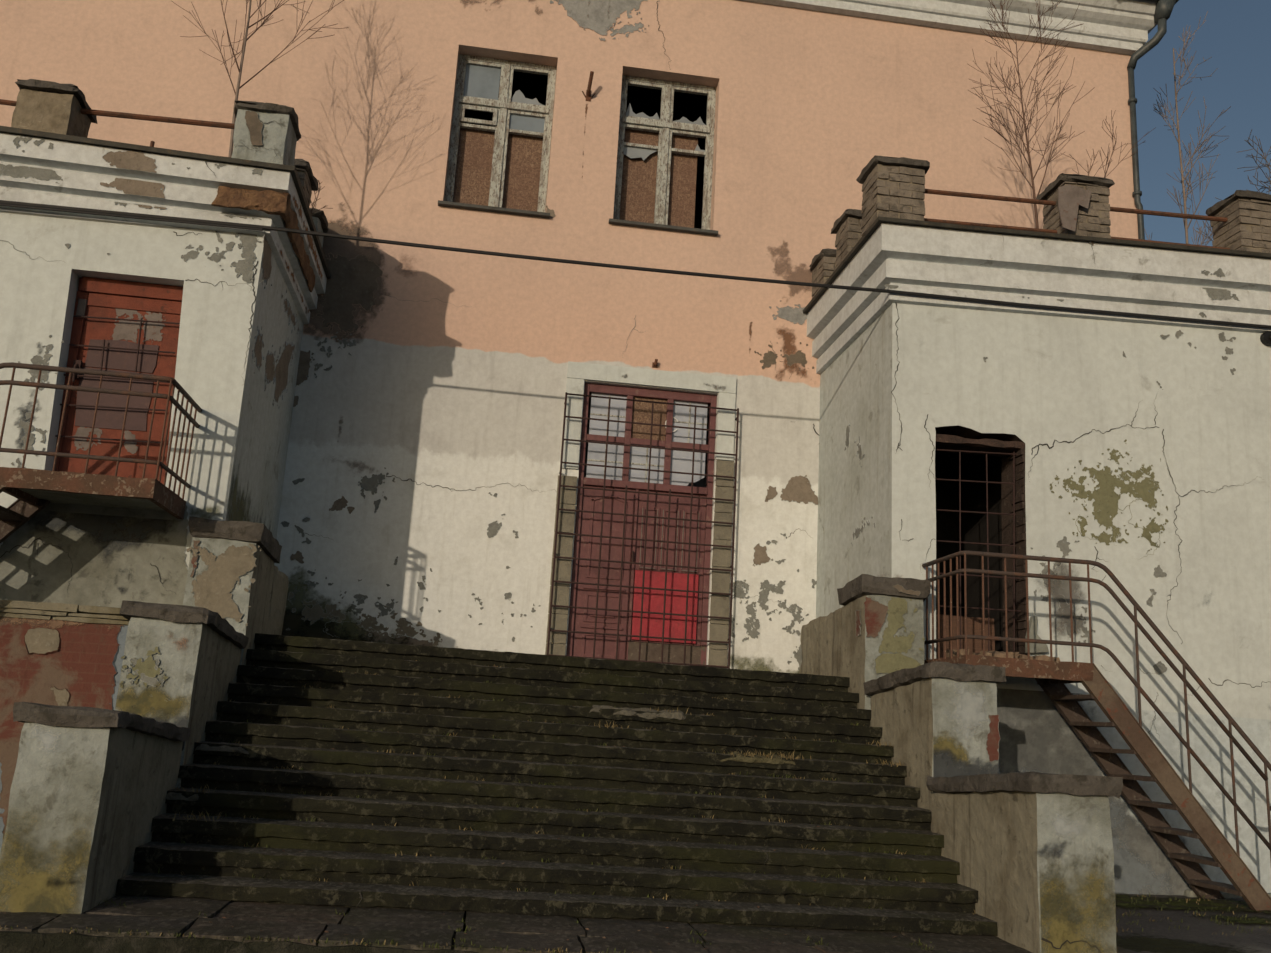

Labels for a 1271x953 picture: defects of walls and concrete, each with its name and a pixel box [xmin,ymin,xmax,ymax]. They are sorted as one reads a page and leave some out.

peeling [550,0,649,42]
peeling [181,214,357,407]
leakage [304,204,386,342]
flaking render [0,503,262,839]
leakage [281,610,381,643]
flaking render [280,517,443,647]
peeling [728,579,809,670]
peeling [753,533,787,566]
peeling [765,475,818,505]
peeling [1031,439,1169,648]
crack [1028,388,1265,644]
crack [1101,665,1267,739]